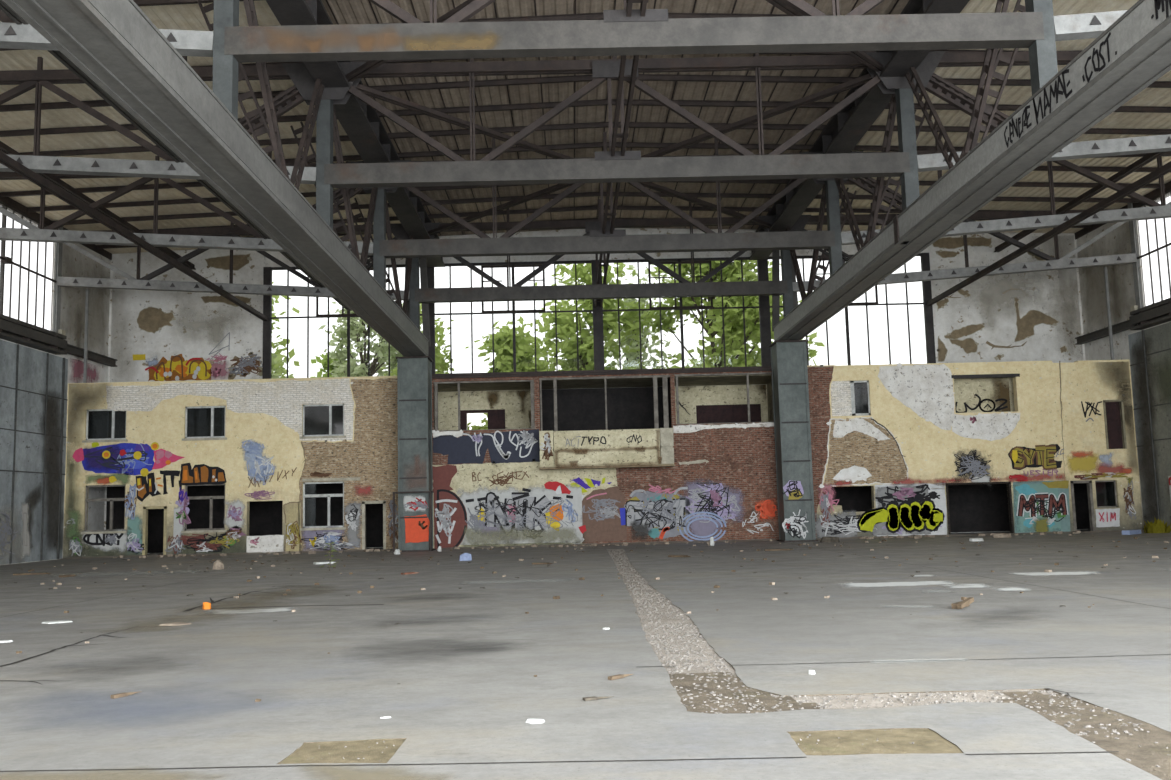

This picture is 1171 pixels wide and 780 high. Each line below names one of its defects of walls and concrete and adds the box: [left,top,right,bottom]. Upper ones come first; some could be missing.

flaking render [205,254,252,271]
flaking render [932,237,992,258]
flaking render [137,307,176,334]
flaking render [201,295,251,307]
flaking render [1014,298,1059,342]
flaking render [878,324,1020,441]
flaking render [106,352,398,551]
flaking render [807,364,909,538]